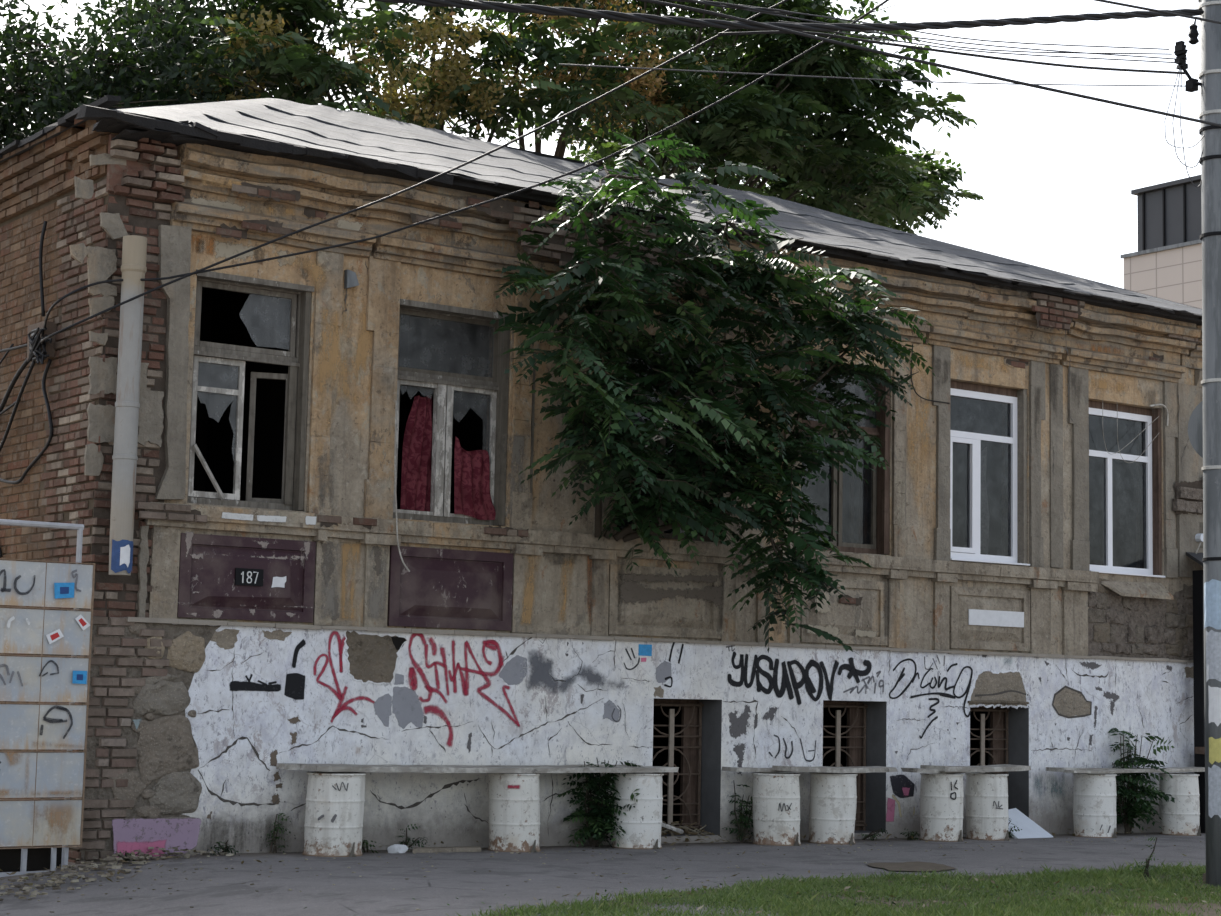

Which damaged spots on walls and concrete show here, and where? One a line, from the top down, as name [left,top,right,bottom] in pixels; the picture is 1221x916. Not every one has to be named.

spalling [1031,292,1085,332]
peeling [222,512,287,522]
spalling [252,515,409,686]
spalling [1079,578,1193,680]
spalling [75,591,239,864]
peeling [288,717,301,745]
crack [197,637,650,836]
spalling [1052,685,1119,746]
peeling [270,749,283,805]